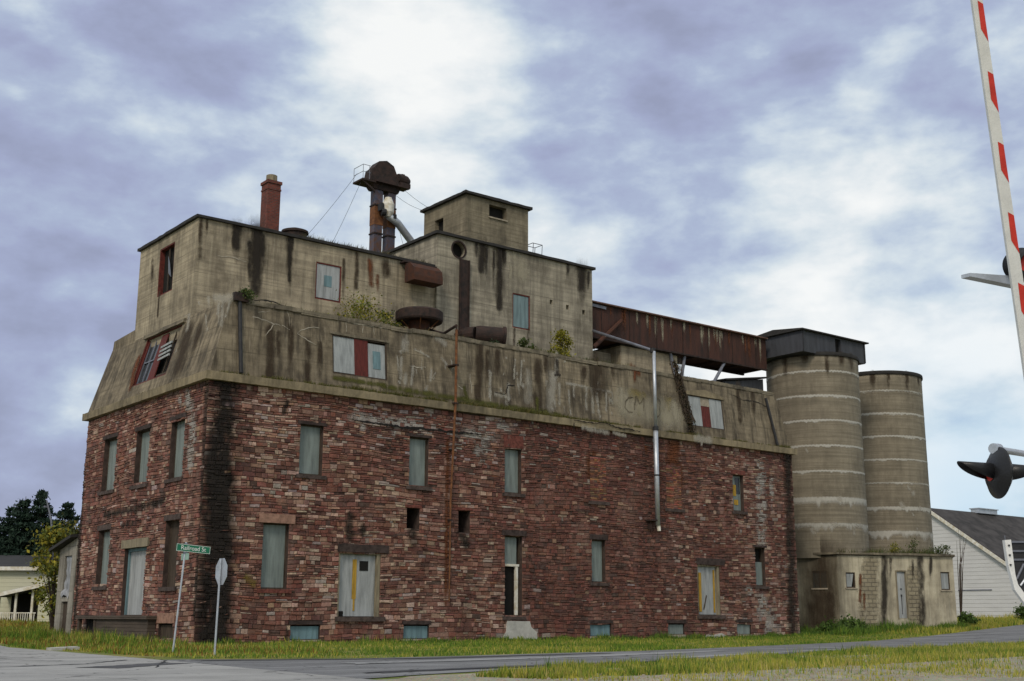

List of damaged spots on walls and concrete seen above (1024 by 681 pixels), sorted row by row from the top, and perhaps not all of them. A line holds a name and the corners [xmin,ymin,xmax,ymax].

damp [232,223,265,293]
damp [475,243,528,310]
damp [459,344,691,434]
damp [178,380,237,643]